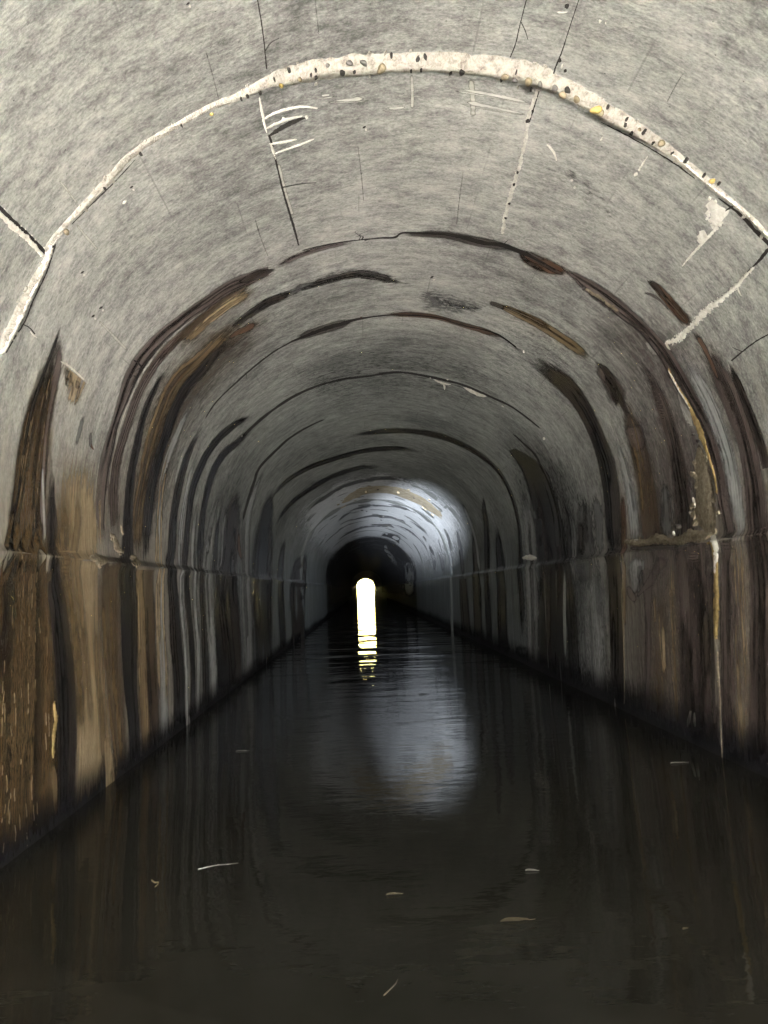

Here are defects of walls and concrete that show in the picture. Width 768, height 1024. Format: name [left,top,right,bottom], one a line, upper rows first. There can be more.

crack [0,206,45,257]
spalling [0,49,768,354]
crack [257,0,579,270]
leakage [0,242,768,869]